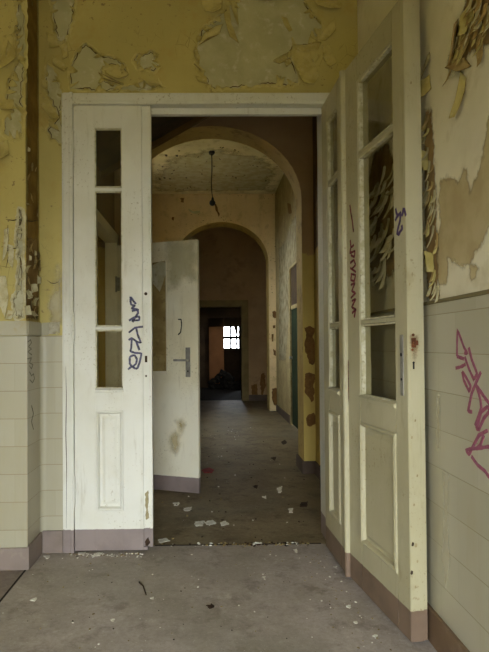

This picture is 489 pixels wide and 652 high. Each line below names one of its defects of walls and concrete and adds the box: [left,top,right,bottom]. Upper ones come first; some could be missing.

peeling [0,0,28,159]
peeling [41,41,167,148]
peeling [192,0,342,93]
peeling [421,52,431,97]
peeling [443,0,489,118]
peeling [0,193,41,321]
peeling [421,109,439,303]
peeling [304,326,315,402]